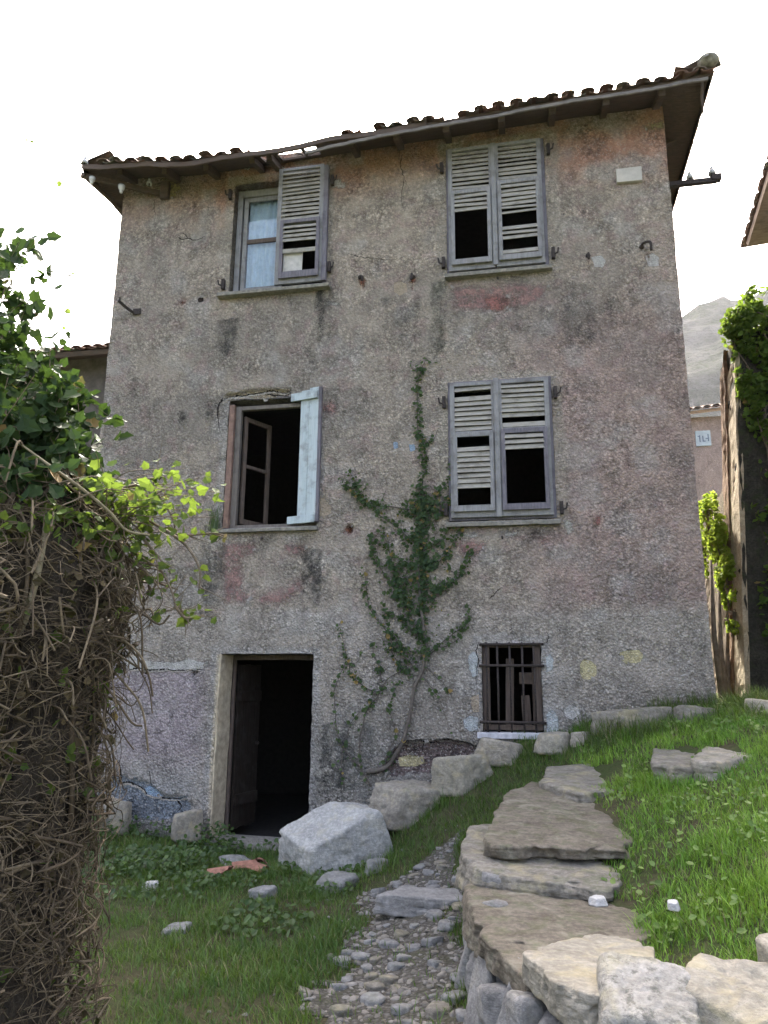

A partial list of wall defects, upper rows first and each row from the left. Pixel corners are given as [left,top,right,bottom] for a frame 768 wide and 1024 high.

spalling [98,773,191,822]